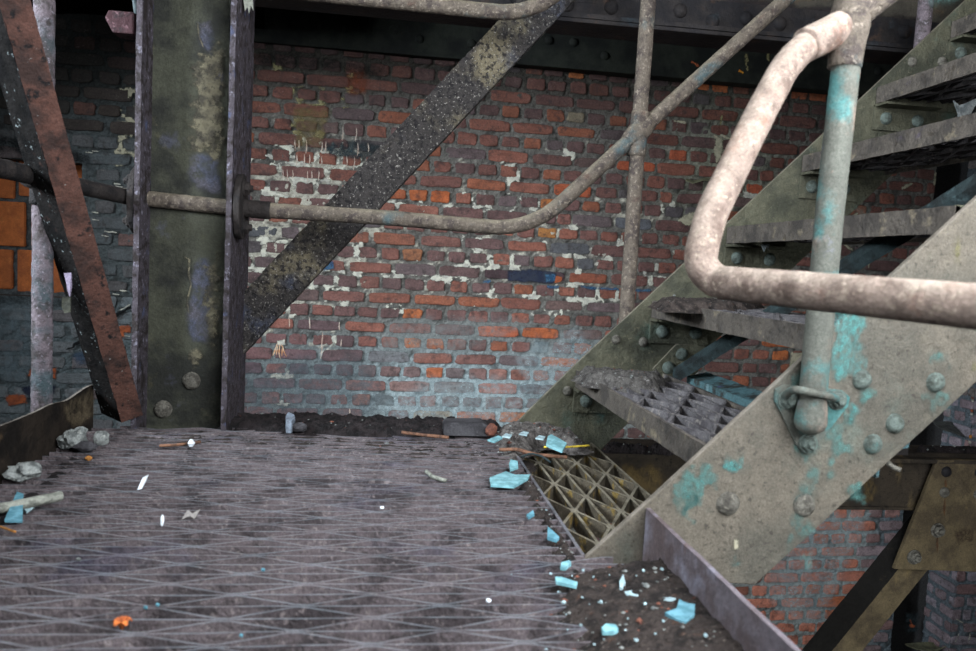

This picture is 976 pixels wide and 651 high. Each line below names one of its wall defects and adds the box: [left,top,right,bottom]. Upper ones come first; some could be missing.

efflorescence [248,236,288,273]
efflorescence [308,270,363,307]
damp [381,235,521,307]
damp [522,235,624,317]
peeling [833,314,865,379]
efflorescence [248,363,373,414]